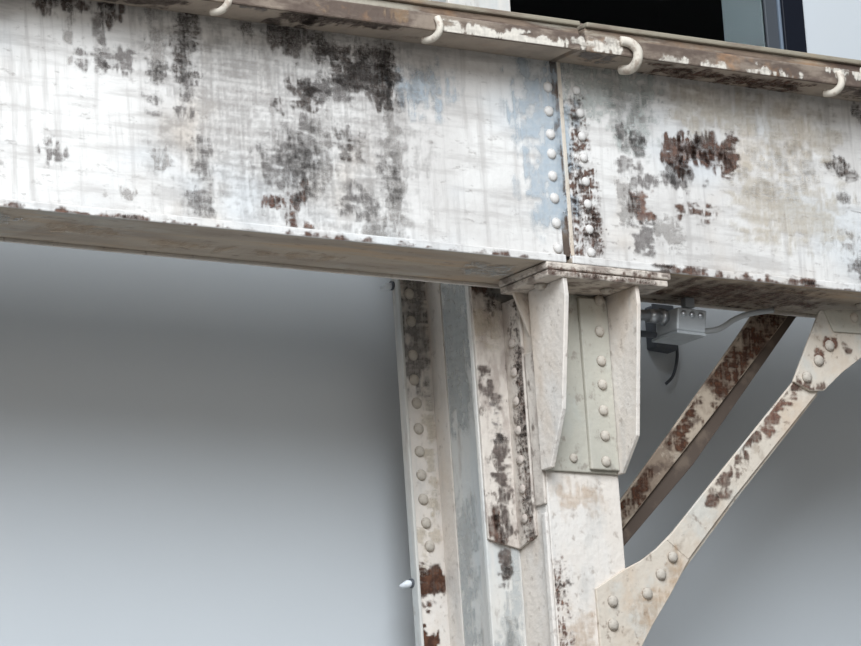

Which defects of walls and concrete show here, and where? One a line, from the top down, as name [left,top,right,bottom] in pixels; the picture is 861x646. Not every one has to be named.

peeling [825,67,861,81]
damp [187,190,214,215]
damp [287,112,336,201]
damp [384,102,405,223]
rust [563,98,607,255]
peeling [826,156,856,181]
rust [665,314,784,452]
rust [705,376,826,507]
rust [620,468,653,519]
rust [423,624,440,646]
rust [419,562,446,613]
peeling [554,569,573,646]